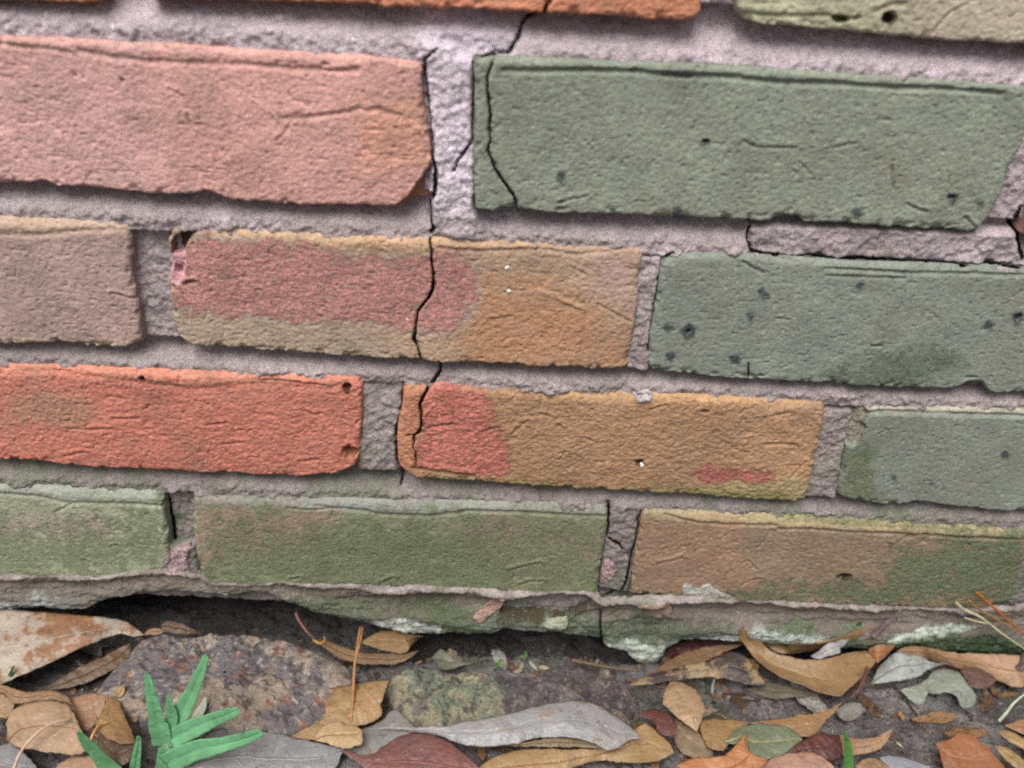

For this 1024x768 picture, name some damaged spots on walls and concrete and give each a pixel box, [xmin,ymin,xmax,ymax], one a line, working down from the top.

crack [395,0,551,486]
crack [746,223,779,256]
crack [808,254,931,263]
crack [957,207,1024,269]
crack [599,500,641,642]
spalling [473,598,594,630]
peeling [638,604,673,618]